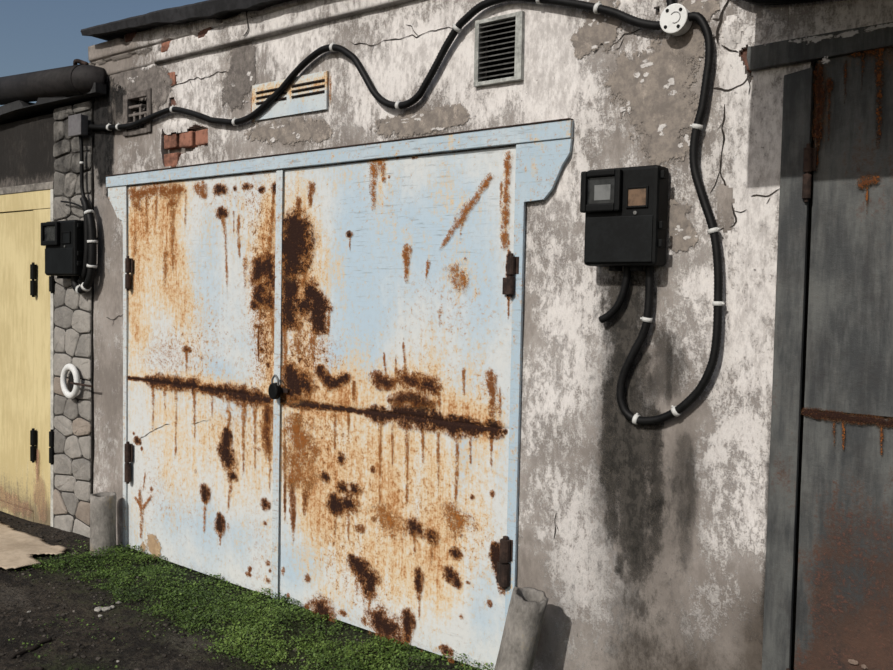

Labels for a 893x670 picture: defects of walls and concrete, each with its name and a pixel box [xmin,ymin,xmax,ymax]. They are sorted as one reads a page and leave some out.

crack [349,25,451,50]
peeling [570,0,720,167]
crack [712,0,738,52]
spalling [164,126,208,167]
rust [369,157,399,210]
rust [441,151,511,278]
crack [710,75,780,230]
rust [127,170,508,595]
damp [595,271,664,581]
rust [801,408,893,455]
rust [304,594,347,622]
rust [347,554,424,646]